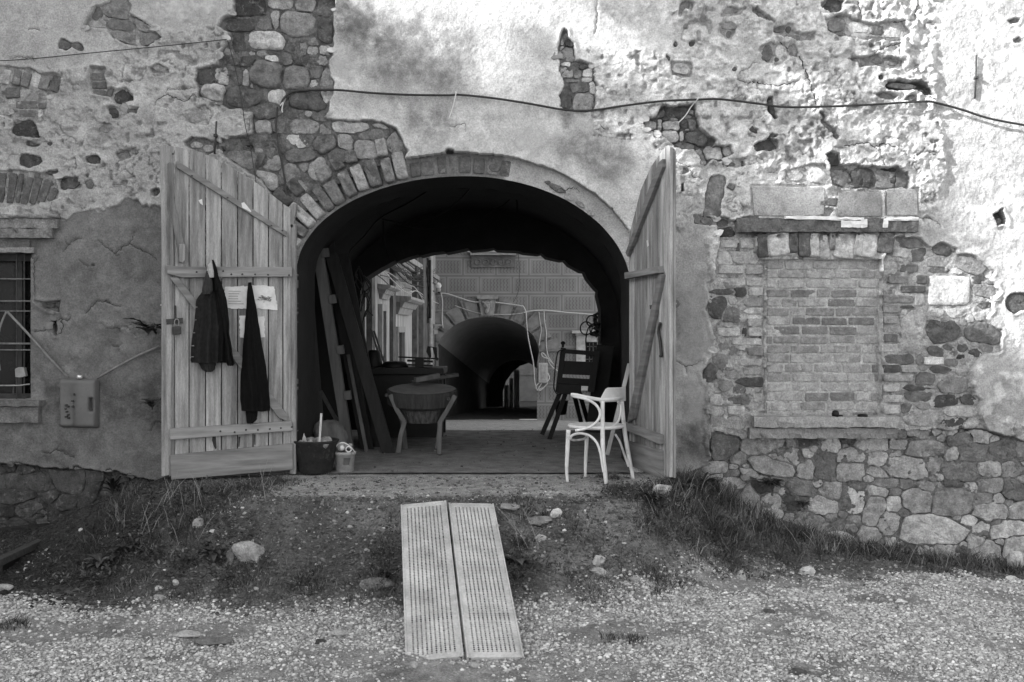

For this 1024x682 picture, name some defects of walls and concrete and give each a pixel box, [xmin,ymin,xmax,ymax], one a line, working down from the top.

spalling [0,66,62,124]
spalling [58,40,84,51]
spalling [80,0,407,221]
spalling [551,31,603,112]
spalling [638,105,745,167]
spalling [820,114,839,139]
spalling [0,170,64,208]
spalling [785,152,910,190]
crack [66,235,157,260]
flaking render [693,215,766,454]
flaking render [880,232,1002,438]